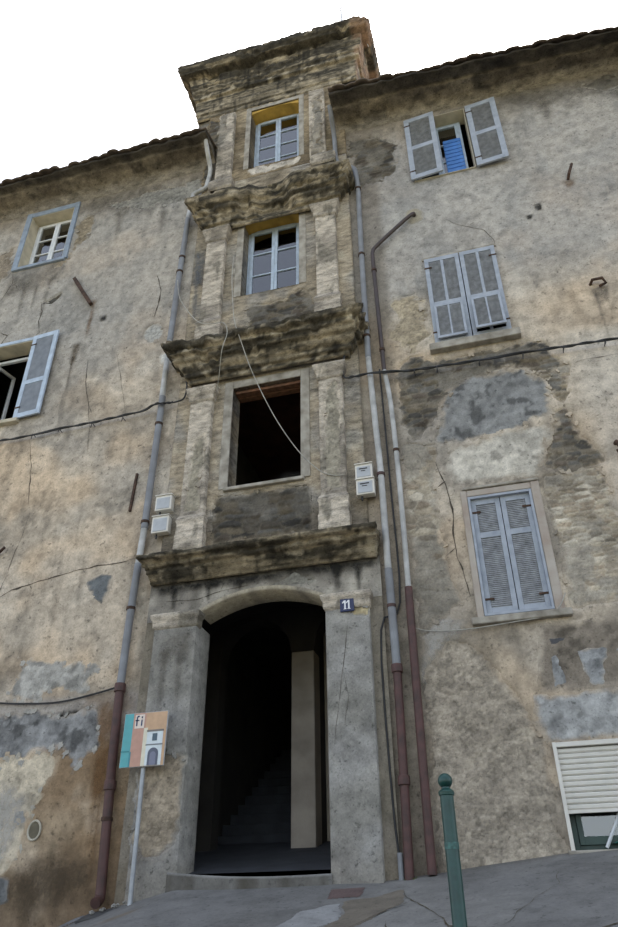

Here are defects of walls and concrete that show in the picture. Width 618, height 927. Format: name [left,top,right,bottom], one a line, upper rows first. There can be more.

spalling [387,293,618,637]
peeling [0,697,101,876]